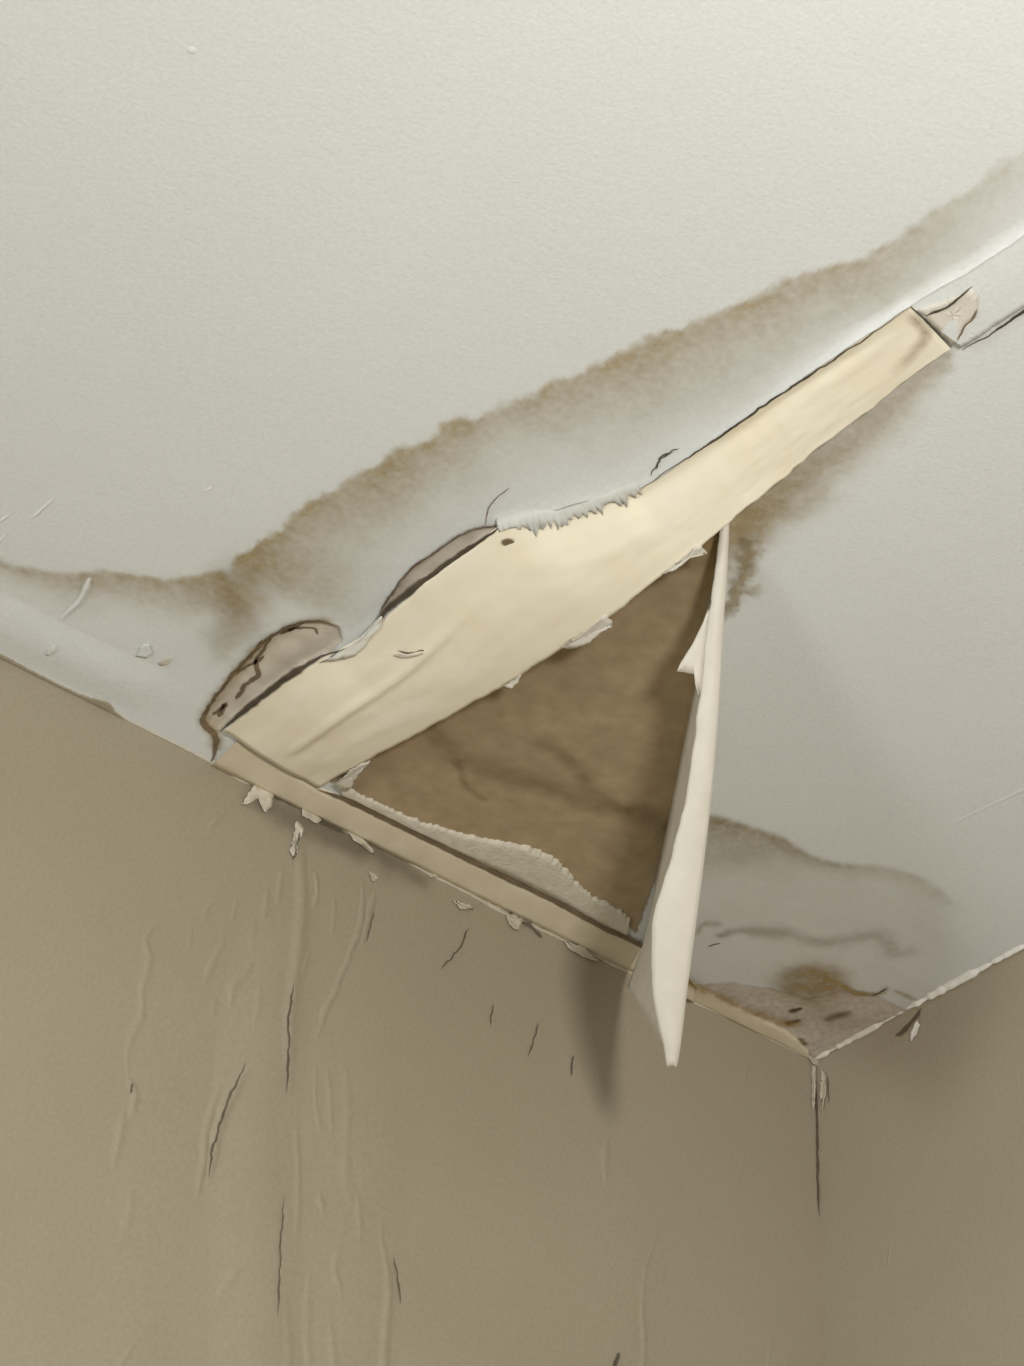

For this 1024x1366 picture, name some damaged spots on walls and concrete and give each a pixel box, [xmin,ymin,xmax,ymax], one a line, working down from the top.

crack [641,286,1024,490]
damp [366,442,435,486]
damp [180,501,324,599]
flaking render [378,488,509,617]
damp [704,482,798,612]
flaking render [200,621,342,762]
damp [709,817,780,843]
damp [699,983,906,1058]